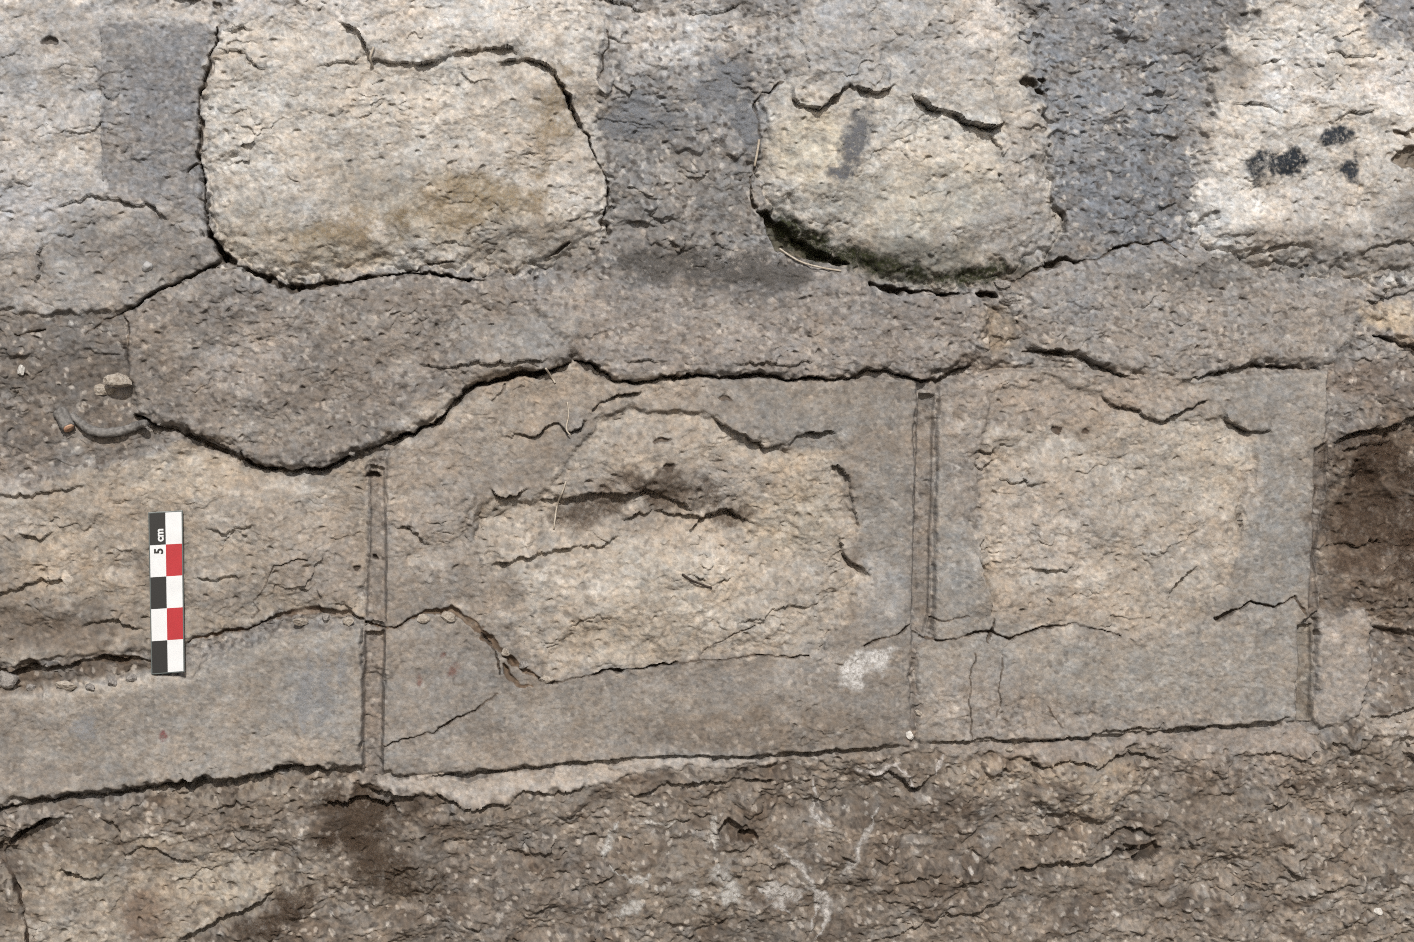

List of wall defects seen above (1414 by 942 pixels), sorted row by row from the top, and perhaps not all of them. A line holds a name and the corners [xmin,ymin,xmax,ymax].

crack [85,28,473,358]
crack [548,30,610,258]
crack [749,81,785,211]
crack [15,329,46,337]
crack [137,360,972,474]
leakage [1314,433,1414,596]
crack [88,654,151,665]
crack [188,559,810,748]
crack [864,616,1122,740]
crack [1213,596,1307,622]
crack [261,764,308,776]
crack [0,782,175,942]